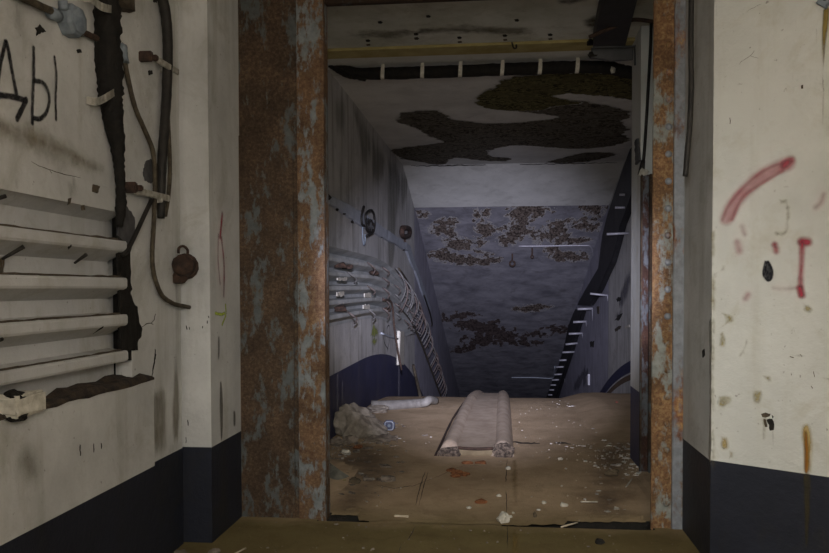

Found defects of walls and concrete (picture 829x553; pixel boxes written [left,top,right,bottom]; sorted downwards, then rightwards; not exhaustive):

peeling [391,73,641,165]
peeling [416,205,608,266]
peeling [440,311,568,354]
rust [803,426,811,540]